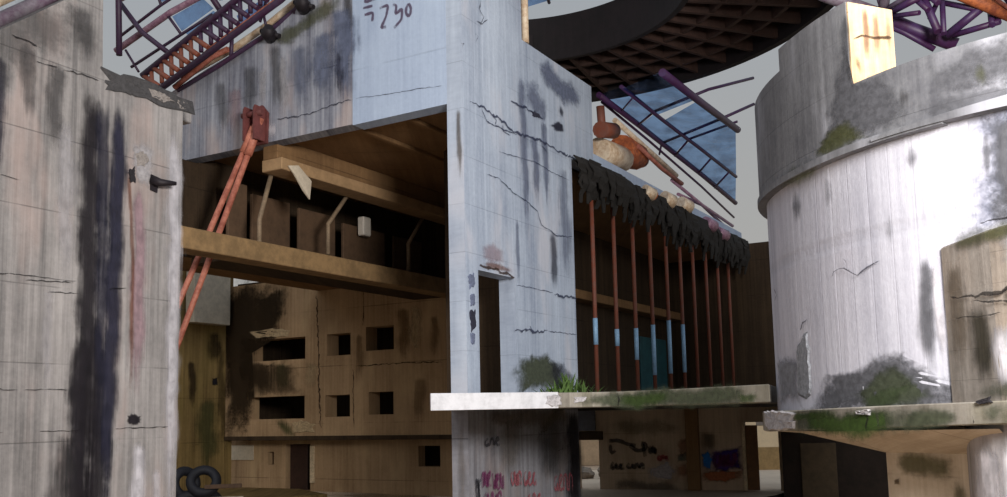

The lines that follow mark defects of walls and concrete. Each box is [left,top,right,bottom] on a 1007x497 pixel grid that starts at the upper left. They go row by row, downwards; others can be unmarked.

crack [470,101,577,180]
crack [488,174,572,237]
leakage [519,64,578,202]
leakage [985,113,1007,224]
crack [0,273,78,294]
leakage [48,68,128,497]
leakage [167,151,180,470]
crack [951,286,1007,319]
leakage [210,280,287,437]
leakage [819,355,953,409]
leakage [977,453,1007,497]